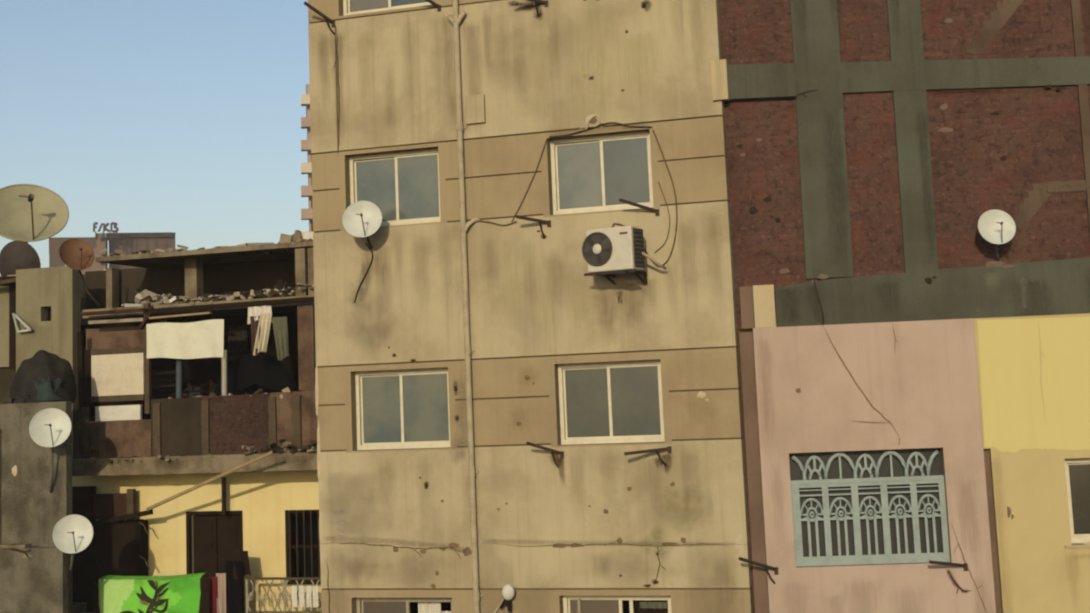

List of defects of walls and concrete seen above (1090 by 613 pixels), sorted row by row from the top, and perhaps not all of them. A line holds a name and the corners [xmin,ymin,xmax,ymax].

crack [823,326,900,445]
crack [493,539,741,586]
crack [947,523,988,613]